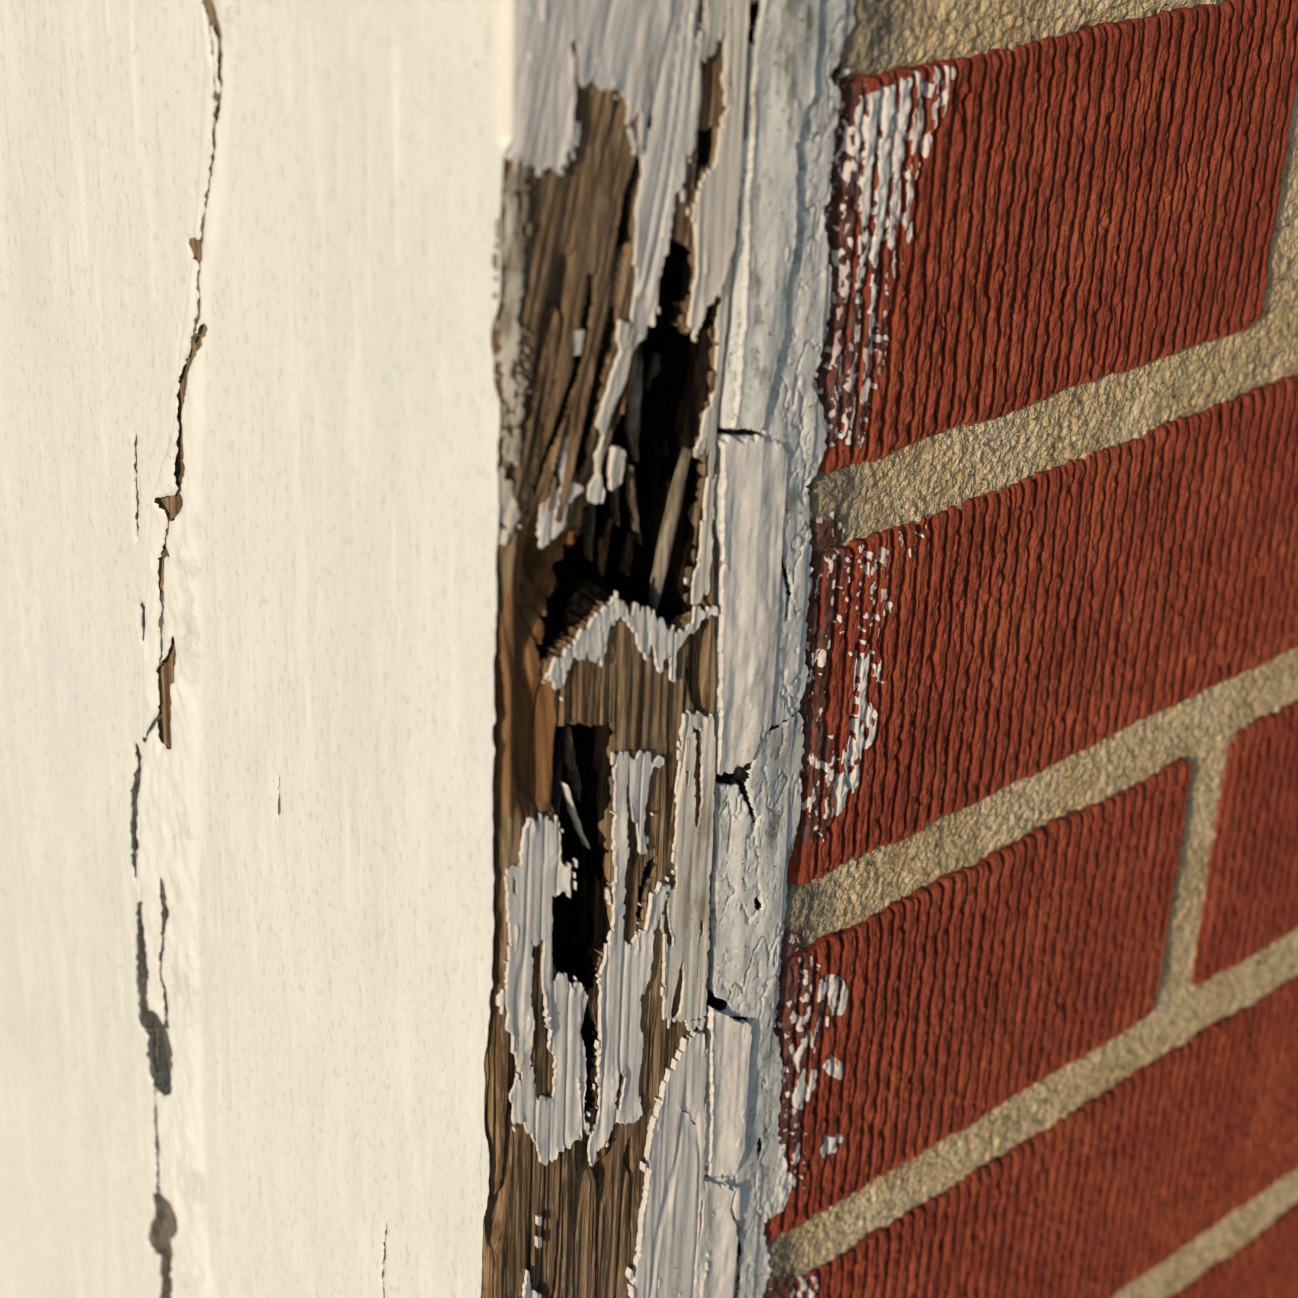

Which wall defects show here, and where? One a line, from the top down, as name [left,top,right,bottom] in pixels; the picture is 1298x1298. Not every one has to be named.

crack [747,0,760,45]
peeling [852,77,913,252]
peeling [492,0,749,702]
crack [130,1,221,1298]
crack [715,715,794,823]
peeling [496,710,752,1298]
peeling [822,975,848,1016]
peeling [791,1055,843,1110]
peeling [820,1134,843,1158]
peeling [800,1276,818,1298]